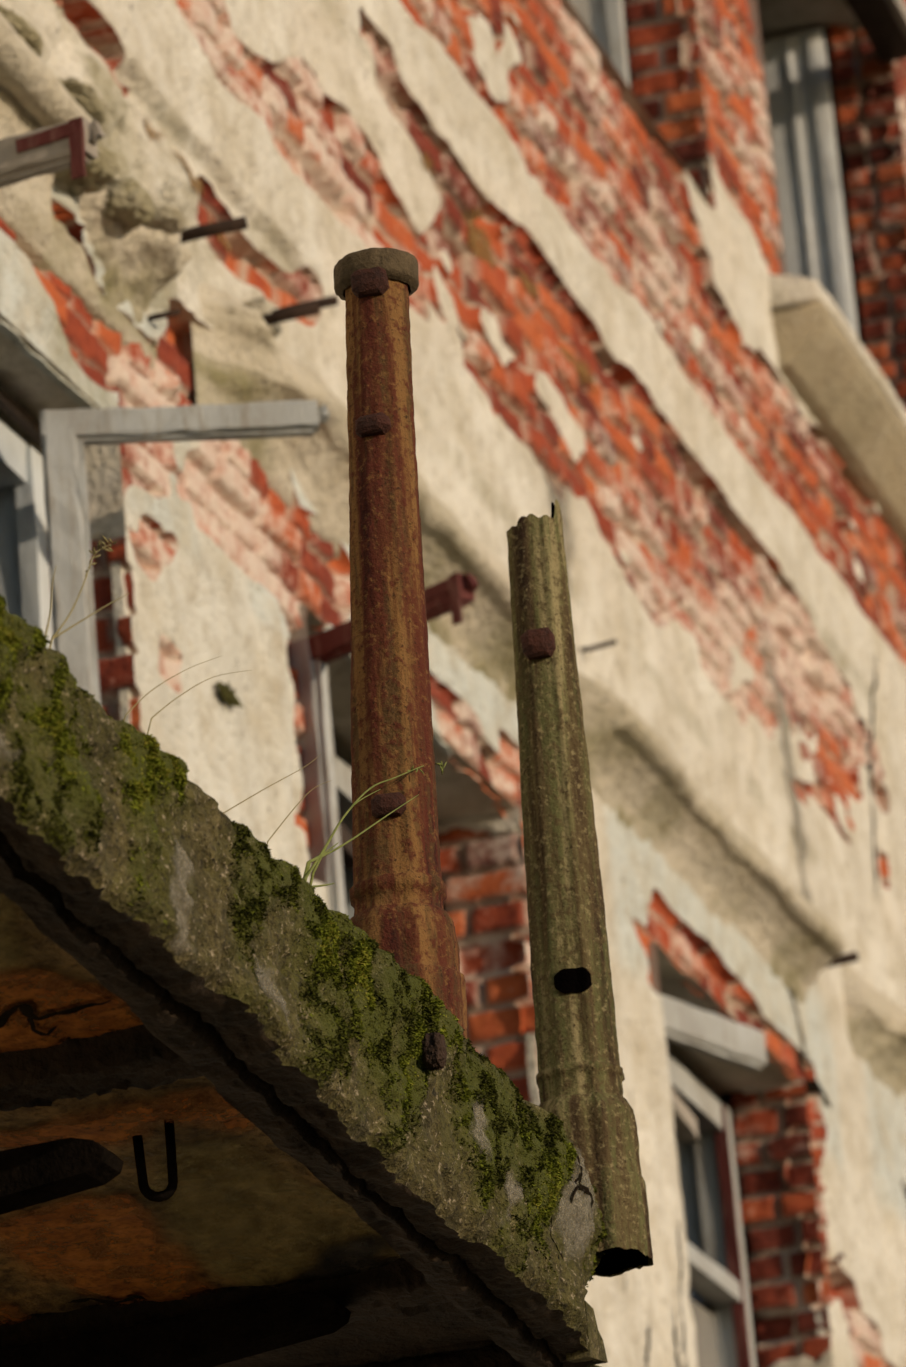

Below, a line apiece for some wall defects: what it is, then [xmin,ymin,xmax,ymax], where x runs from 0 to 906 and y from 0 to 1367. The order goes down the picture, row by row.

spalling [176,0,906,846]
spalling [90,514,179,733]
spalling [120,440,351,850]
efflorescence [171,844,193,947]
crack [0,999,111,1036]
rust [0,971,143,1053]
rust [0,1090,252,1149]
efflorescence [473,1105,488,1148]
spalling [632,889,895,1367]
rust [0,1195,210,1305]
water stain [506,1179,522,1200]
water stain [559,1152,595,1250]